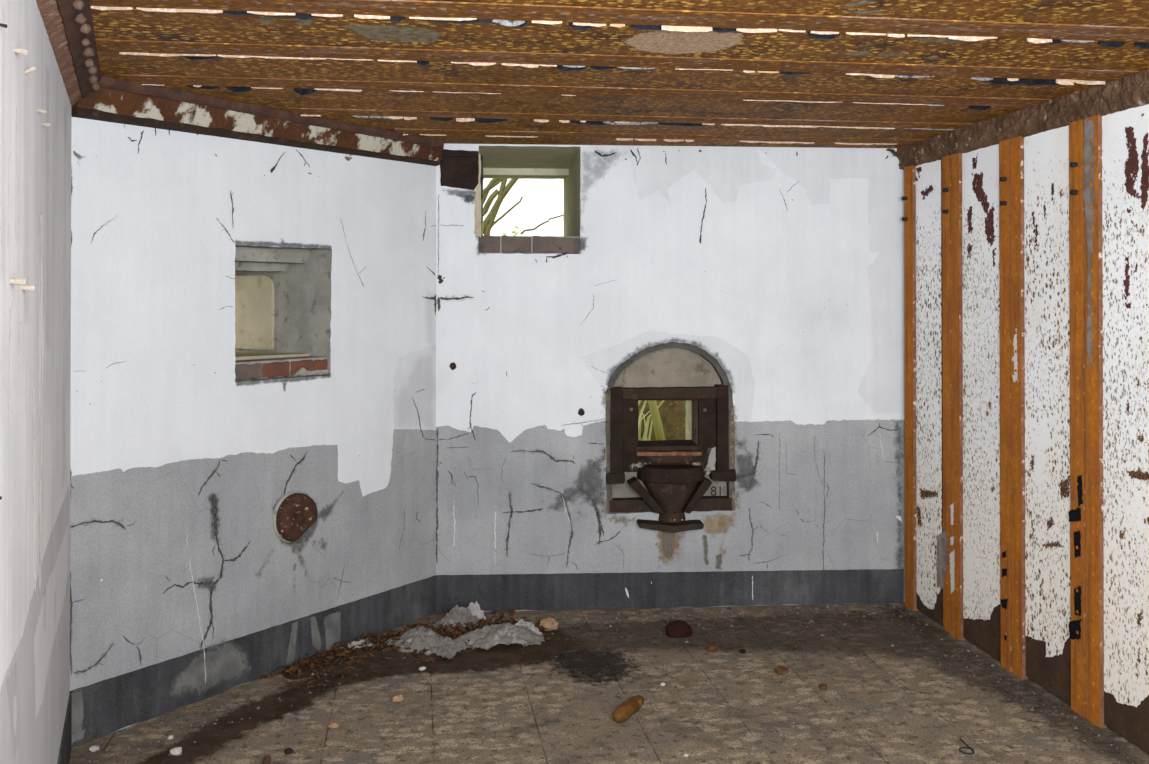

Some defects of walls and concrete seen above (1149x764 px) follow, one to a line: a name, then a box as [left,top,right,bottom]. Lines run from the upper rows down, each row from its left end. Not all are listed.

peeling [624,30,743,55]
crack [399,389,624,568]
peeling [1125,469,1149,483]
crack [72,519,135,529]
crack [163,460,250,649]
water stain [703,535,722,569]
crack [70,572,144,674]